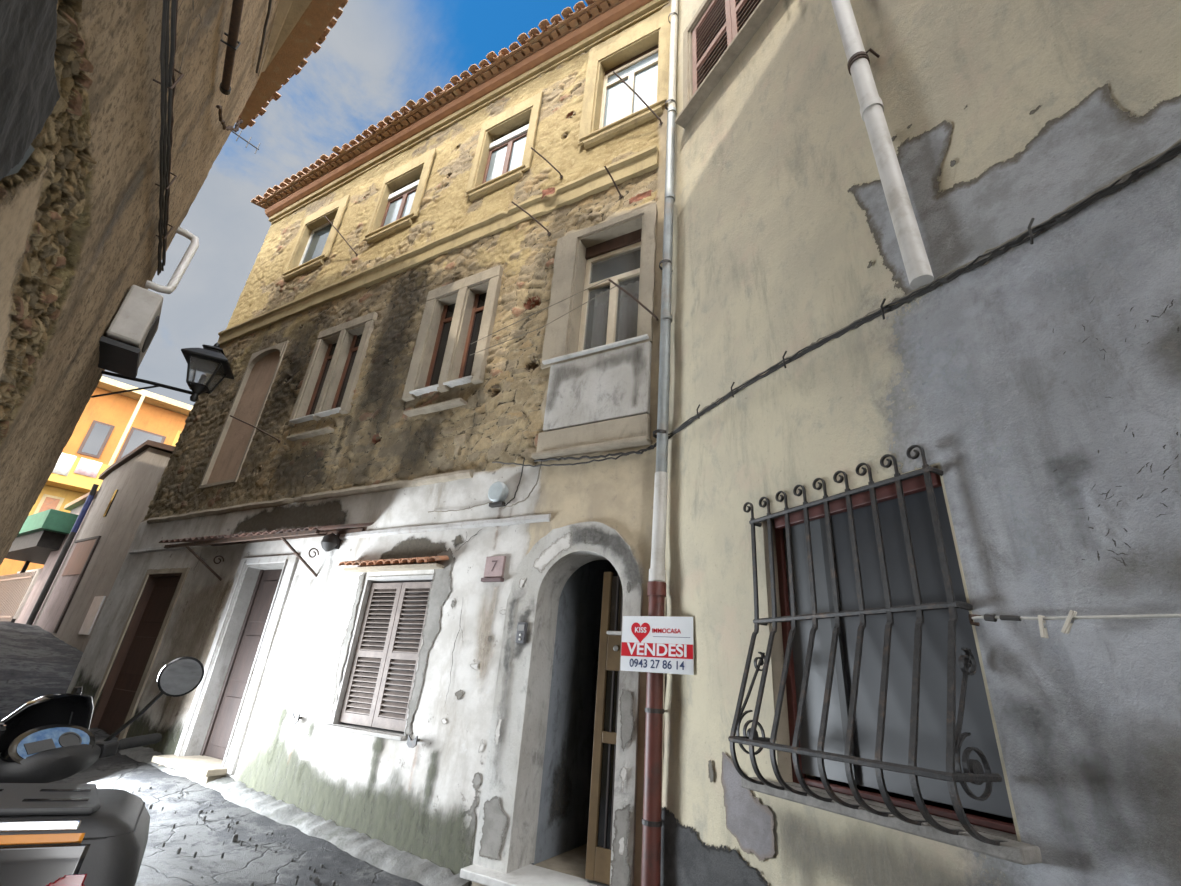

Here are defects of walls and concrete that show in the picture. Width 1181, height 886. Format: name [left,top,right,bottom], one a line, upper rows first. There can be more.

damp [552,368,579,397]
peeling [848,84,1181,886]
damp [237,708,474,886]
peeling [463,772,507,860]